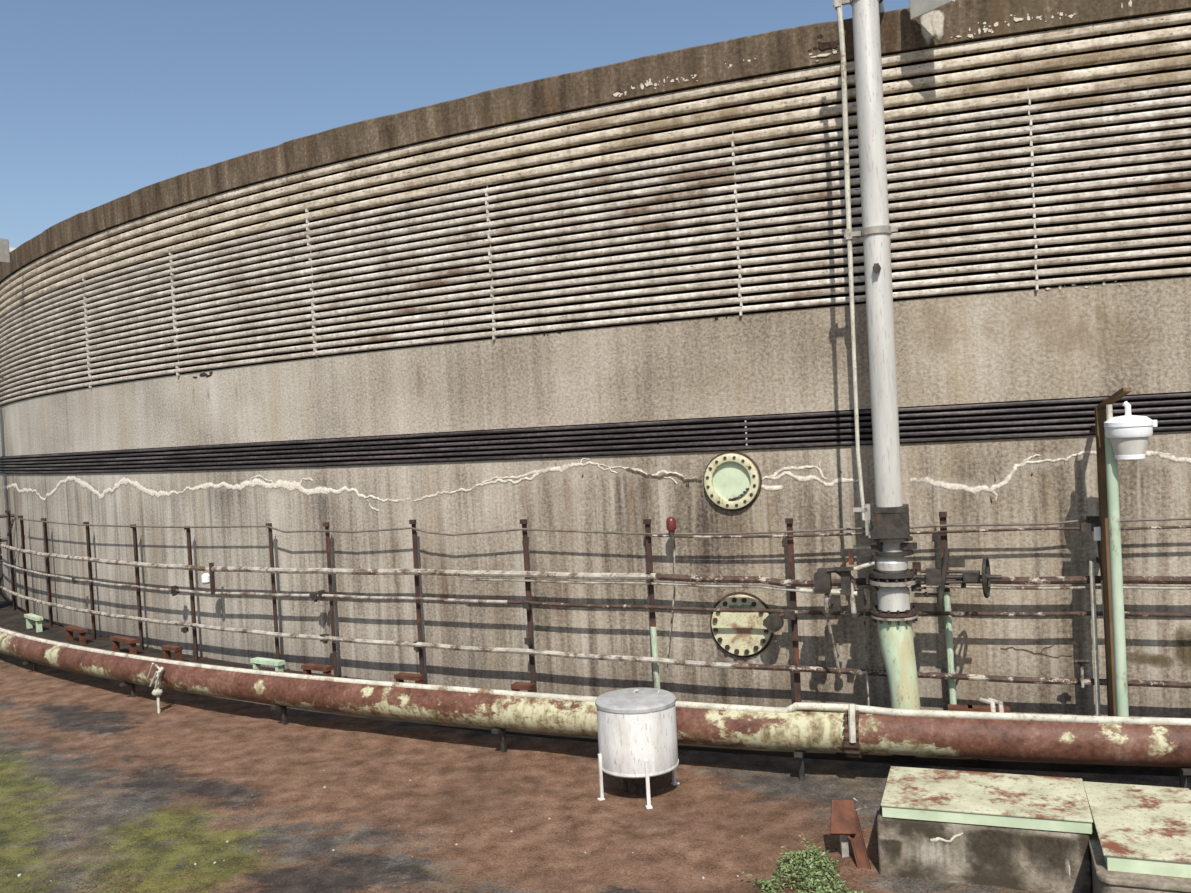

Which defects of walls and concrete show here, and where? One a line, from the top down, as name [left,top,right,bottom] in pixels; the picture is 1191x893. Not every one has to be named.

spalling [950,12,1076,40]
spalling [613,74,698,97]
crack [1136,451,1191,463]
crack [3,458,702,511]
crack [761,461,859,490]
crack [910,451,1096,500]
water stain [1132,655,1170,665]